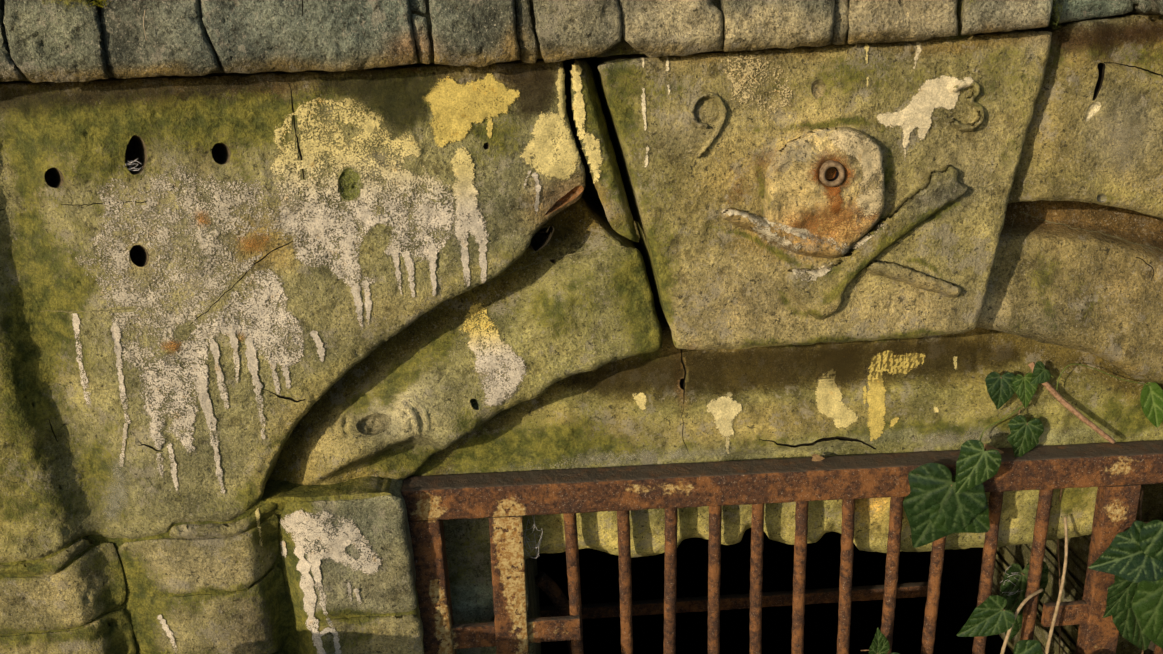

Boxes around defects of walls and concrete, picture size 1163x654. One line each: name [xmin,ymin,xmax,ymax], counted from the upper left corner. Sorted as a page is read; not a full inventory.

crack [1104,62,1163,77]
corrosion [787,158,875,237]
damp [75,64,603,519]
damp [72,313,91,404]
crack [680,349,689,454]
crack [759,436,876,450]
damp [280,509,381,654]